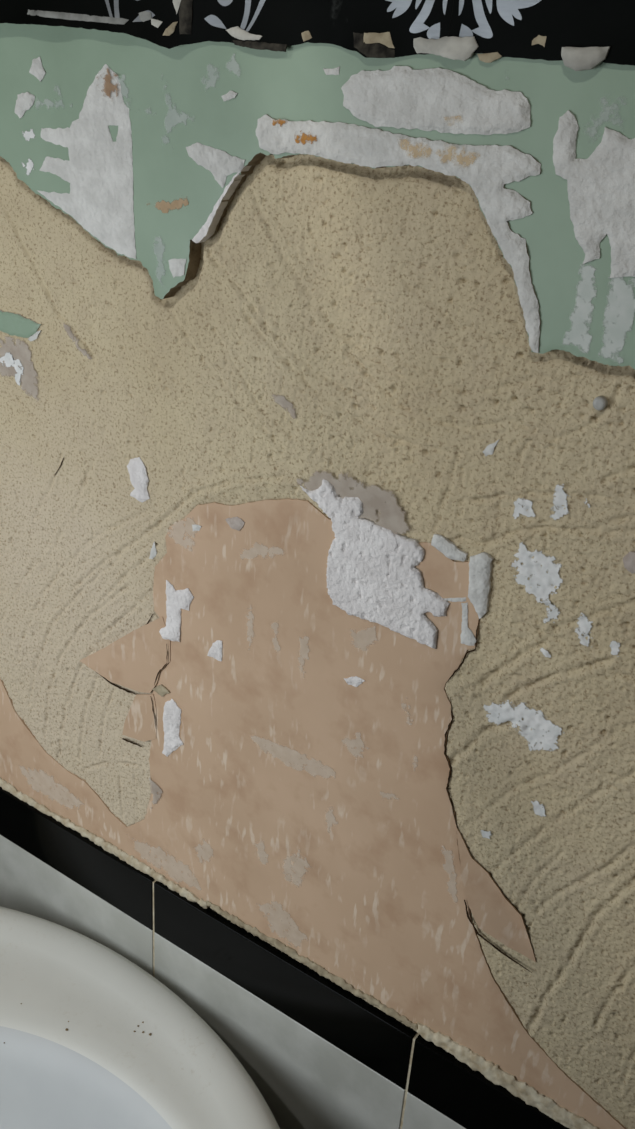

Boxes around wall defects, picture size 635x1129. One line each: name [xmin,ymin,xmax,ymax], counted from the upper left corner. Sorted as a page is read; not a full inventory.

flaking render [29,56,46,82]
flaking render [221,91,238,101]
peeling [15,64,137,259]
flaking render [168,259,186,278]
peeling [127,457,150,502]
crack [96,644,168,747]
peeling [0,479,627,1129]
crack [464,900,532,973]